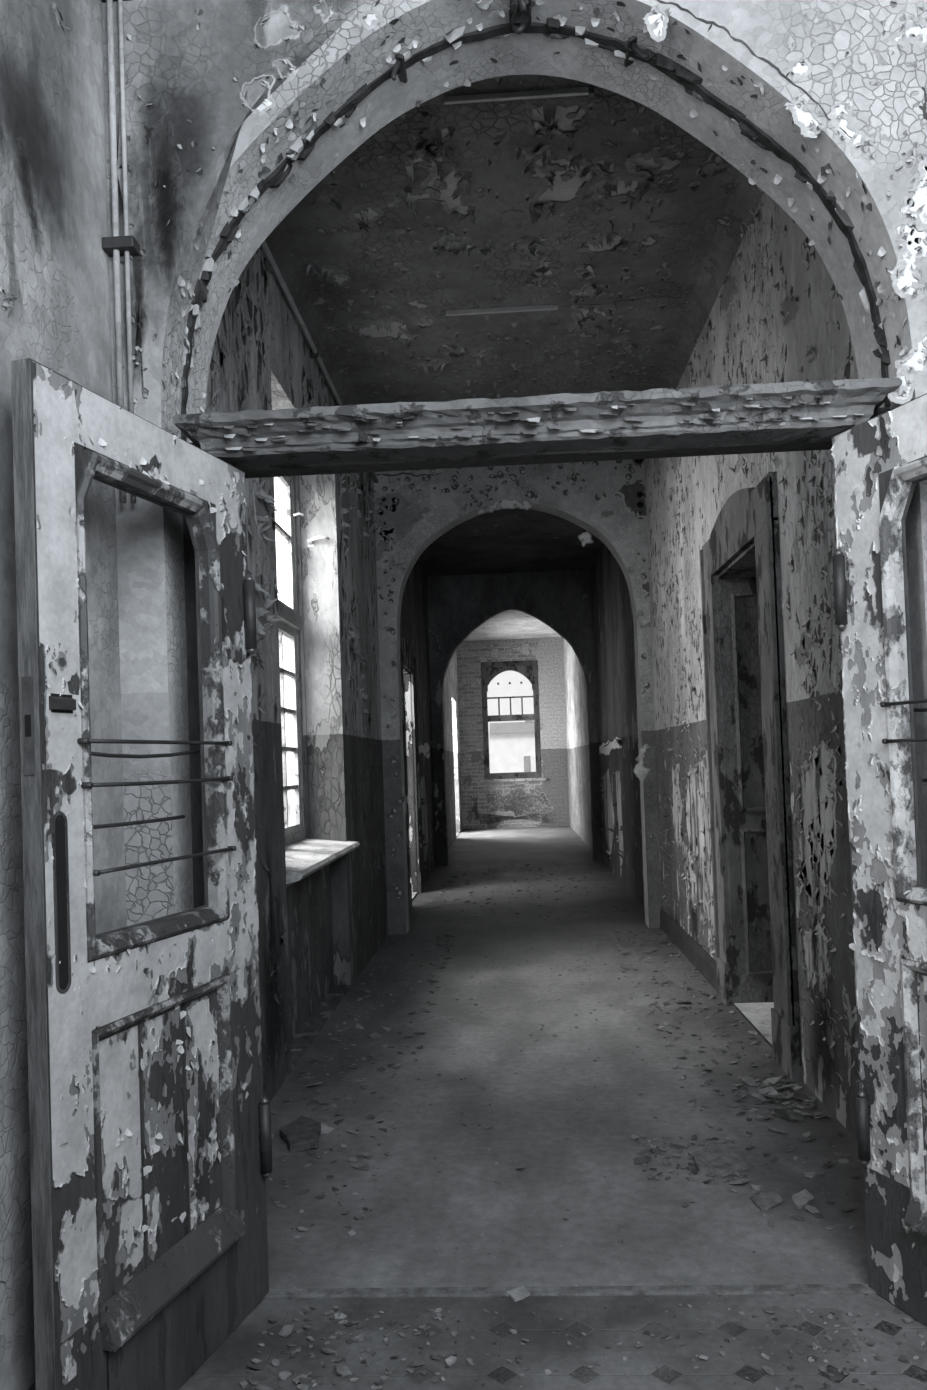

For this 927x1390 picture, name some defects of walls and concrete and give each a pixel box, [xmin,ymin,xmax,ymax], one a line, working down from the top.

water stain [125,98,199,355]
peeling [166,0,422,354]
peeling [349,138,482,241]
peeling [521,99,665,222]
peeling [531,0,764,99]
crack [657,0,852,138]
peeling [775,57,872,246]
crack [918,87,927,120]
peeling [129,457,170,485]
peeling [796,740,837,989]
peeling [169,1000,194,1070]
peeling [143,1133,190,1176]